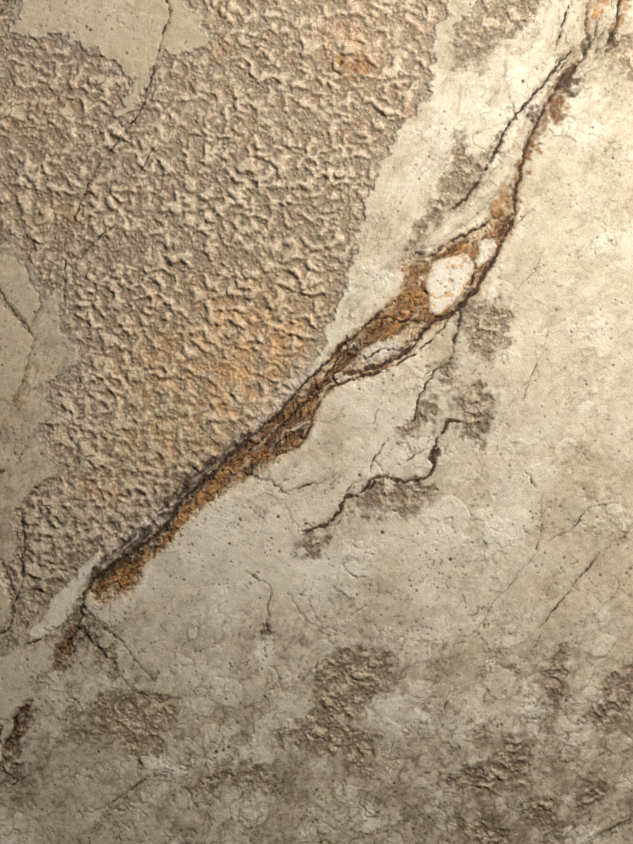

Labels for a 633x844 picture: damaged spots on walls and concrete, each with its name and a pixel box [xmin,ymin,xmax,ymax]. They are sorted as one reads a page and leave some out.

crack [0,516,26,634]
flaking render [191,763,279,801]
flaking render [0,0,538,786]
crack [29,0,622,699]
corrosion [92,58,578,599]